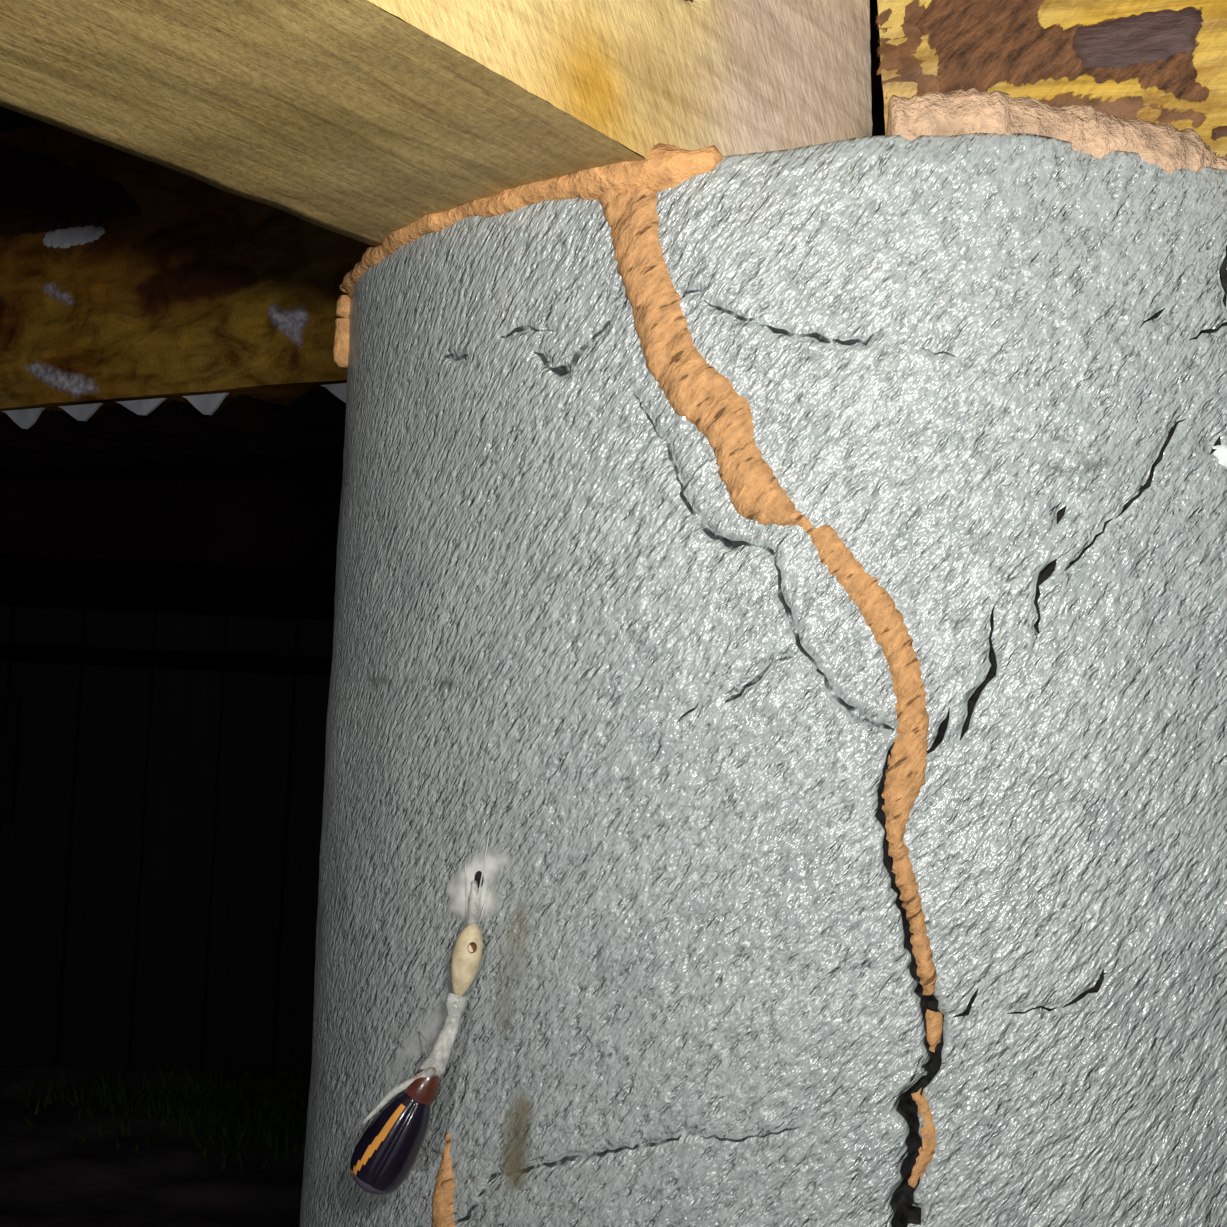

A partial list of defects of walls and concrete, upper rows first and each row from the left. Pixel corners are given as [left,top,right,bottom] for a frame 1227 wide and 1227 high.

crack [444,352,469,360]
crack [501,305,626,376]
crack [685,290,881,345]
crack [1140,308,1165,327]
crack [1189,245,1227,340]
crack [1210,436,1221,455]
crack [1034,419,1185,633]
crack [927,605,997,754]
crack [633,390,978,1227]
crack [1007,969,1104,1014]
crack [456,1127,799,1224]